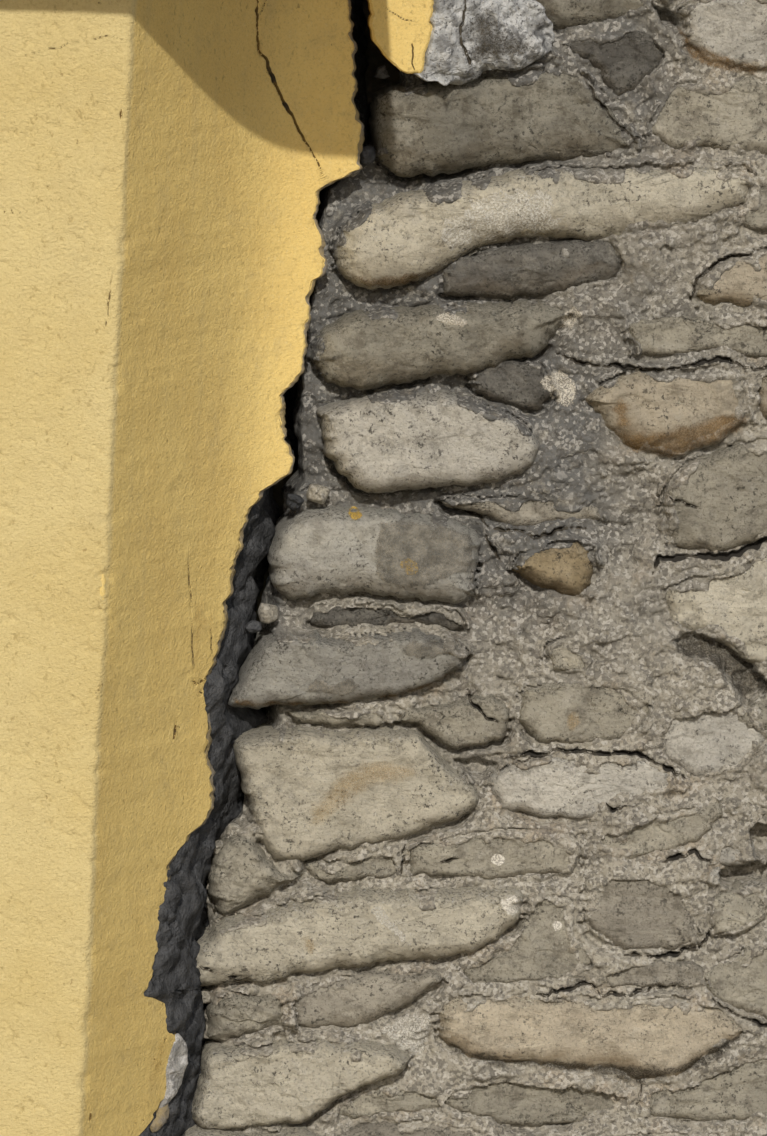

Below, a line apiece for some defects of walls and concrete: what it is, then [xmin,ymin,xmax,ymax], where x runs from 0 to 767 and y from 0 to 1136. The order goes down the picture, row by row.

crack [255,0,323,176]
crack [362,0,432,145]
crack [459,0,472,67]
peeling [413,0,555,86]
crack [289,382,298,400]
crack [273,451,299,516]
crack [256,569,269,622]
spalling [135,1033,188,1133]